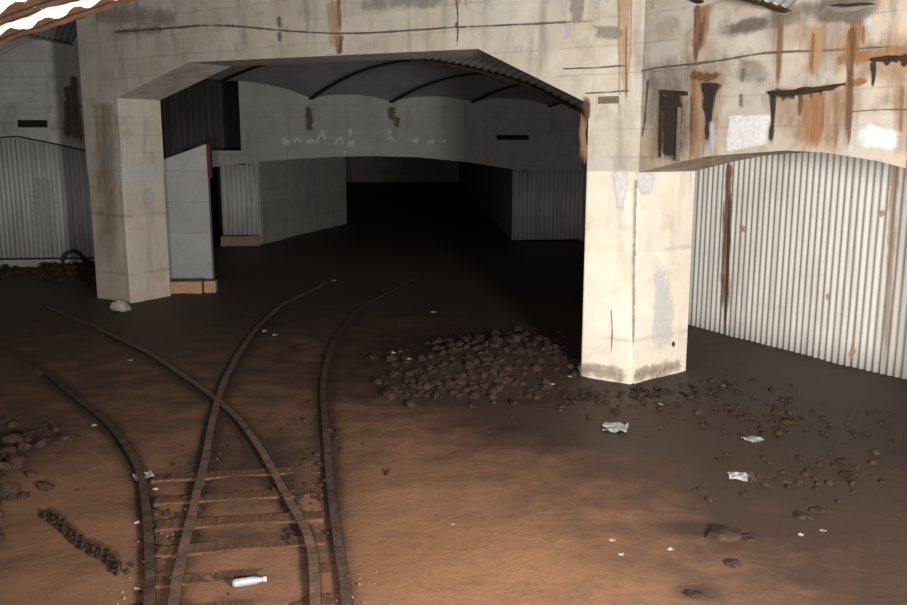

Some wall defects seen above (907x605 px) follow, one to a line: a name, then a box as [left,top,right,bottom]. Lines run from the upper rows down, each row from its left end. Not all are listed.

rust [64,76,83,139]
rust [331,0,342,54]
rust [619,26,629,97]
rust [690,5,720,158]
rust [803,20,907,144]
rust [720,163,745,335]